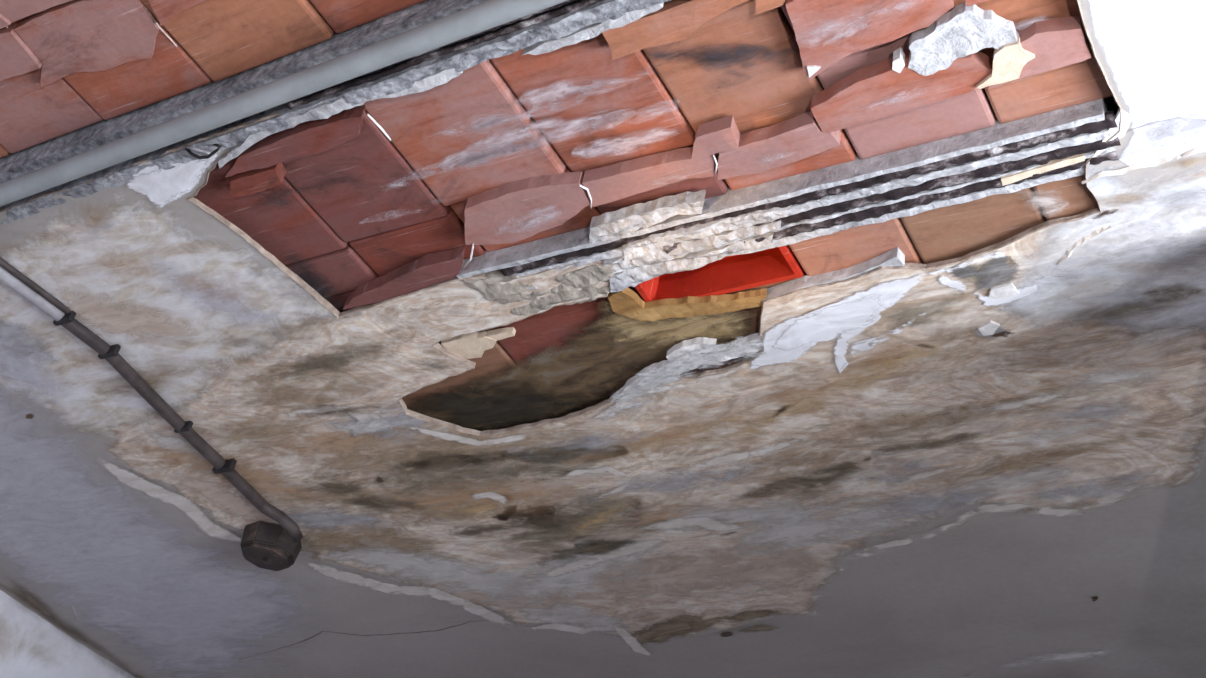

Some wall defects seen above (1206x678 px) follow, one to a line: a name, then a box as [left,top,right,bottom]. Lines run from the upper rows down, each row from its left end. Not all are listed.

spalling [287,0,604,109]
flaking render [126,151,221,208]
spalling [398,0,1206,436]
water stain [773,293,954,367]
flaking render [0,161,1206,677]
water stain [19,591,101,650]
water stain [632,610,777,643]